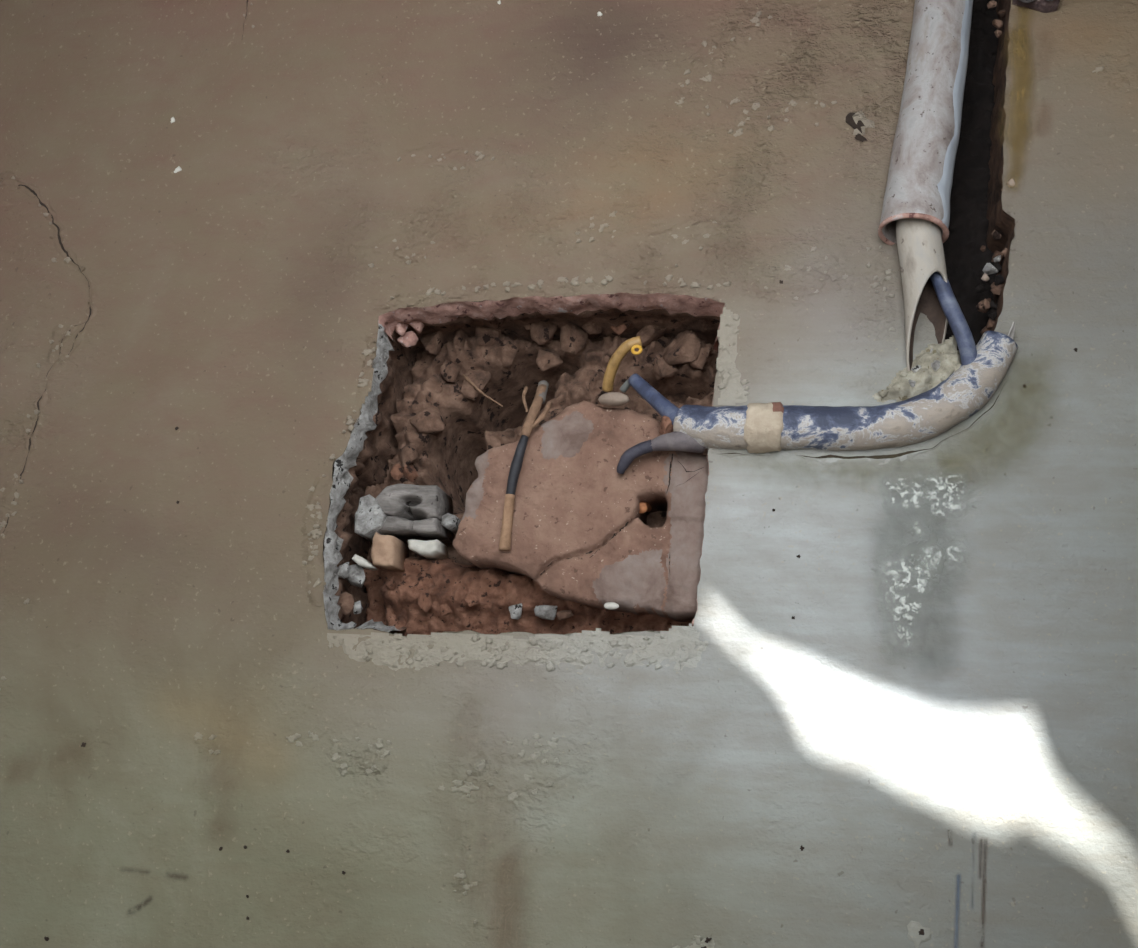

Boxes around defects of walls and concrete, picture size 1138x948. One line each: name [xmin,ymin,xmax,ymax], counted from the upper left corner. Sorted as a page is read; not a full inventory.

crack [0,176,97,556]
spalling [300,210,749,671]
damp [884,457,963,644]